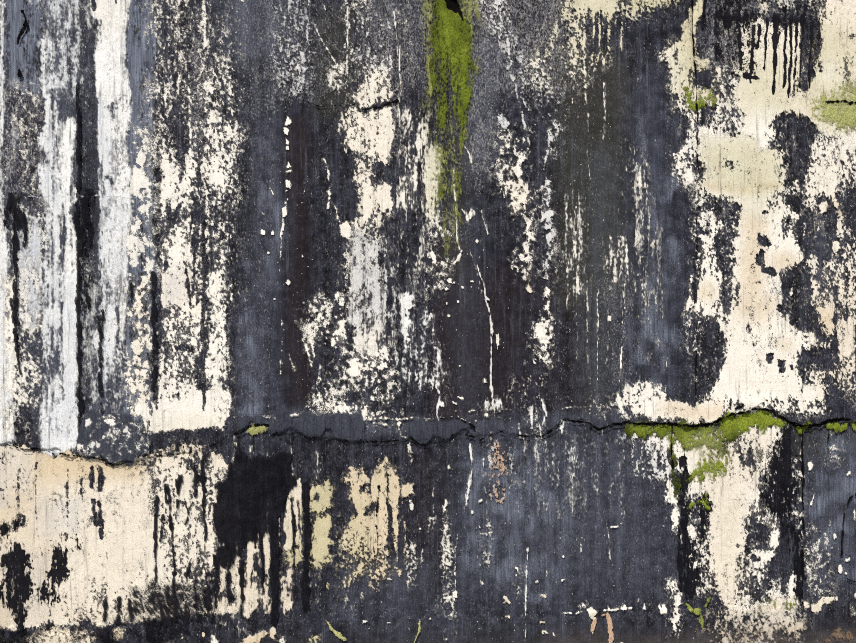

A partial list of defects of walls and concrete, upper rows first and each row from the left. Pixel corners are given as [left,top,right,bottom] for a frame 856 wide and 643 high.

spalling [0,0,414,643]
peeling [271,0,474,462]
crack [445,0,463,20]
damp [453,170,462,264]
peeling [473,0,679,380]
crack [691,0,699,181]
peeling [589,0,856,424]
damp [701,0,823,98]
crack [825,98,856,106]
crack [234,265,856,607]
damp [617,423,856,619]
peeling [706,451,850,643]